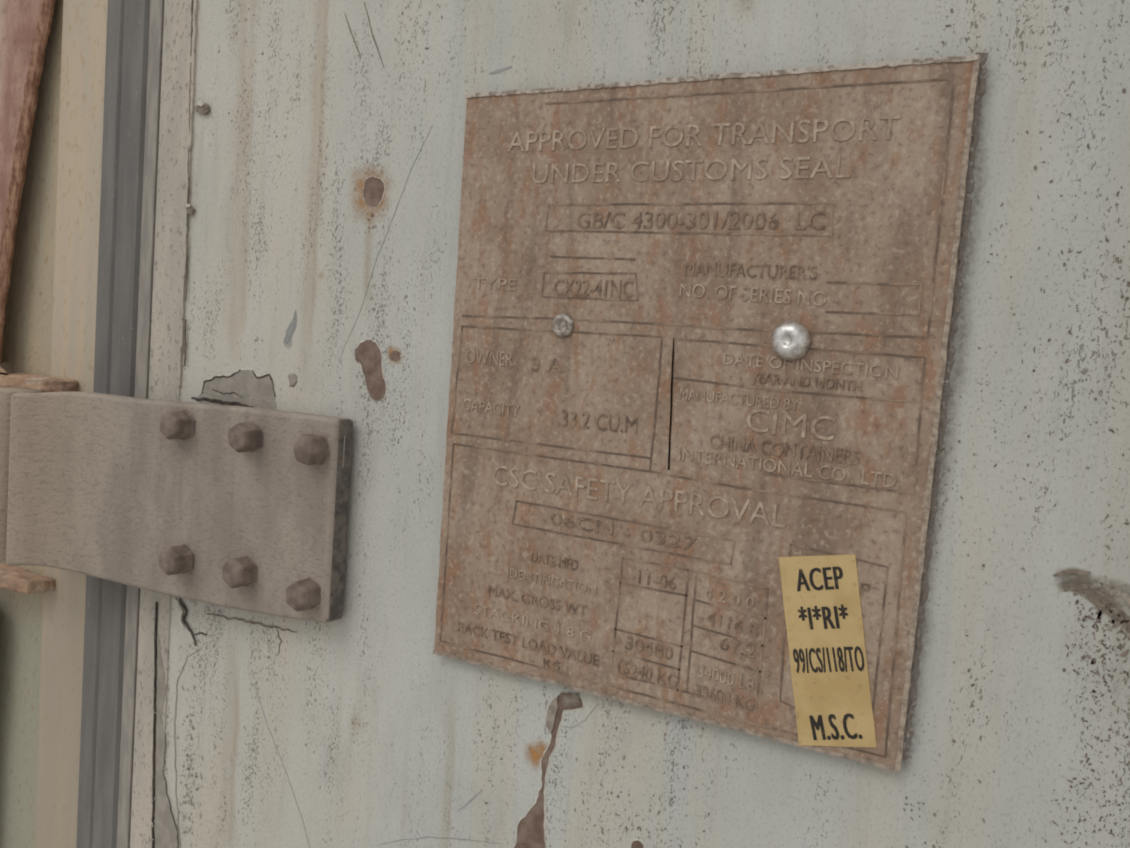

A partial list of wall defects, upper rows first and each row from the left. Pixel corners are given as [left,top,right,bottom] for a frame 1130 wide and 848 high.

corrosion [358,176,386,233]
spalling [191,338,276,409]
crack [173,597,297,656]
spalling [1050,560,1130,848]
peeling [513,690,585,848]